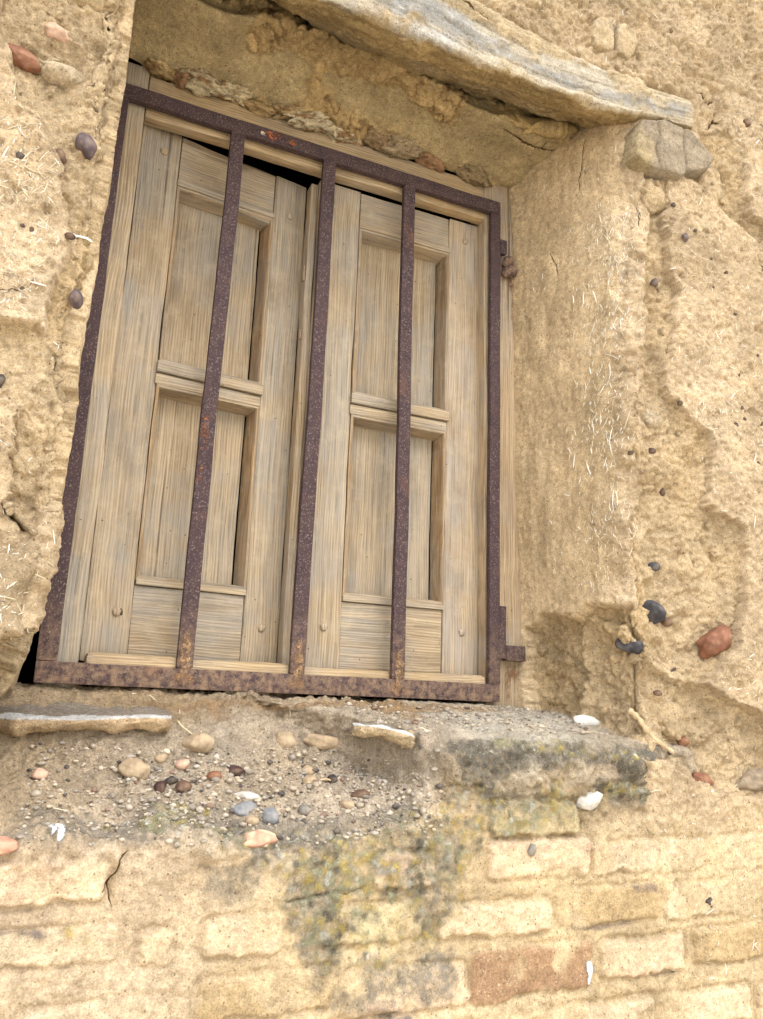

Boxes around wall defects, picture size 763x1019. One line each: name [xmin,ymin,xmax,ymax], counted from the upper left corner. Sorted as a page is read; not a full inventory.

spalling [0,0,125,641]
corrosion [176,634,192,685]
corrosion [293,652,489,714]
water stain [447,739,660,805]
water stain [9,804,361,855]
water stain [366,951,455,1005]